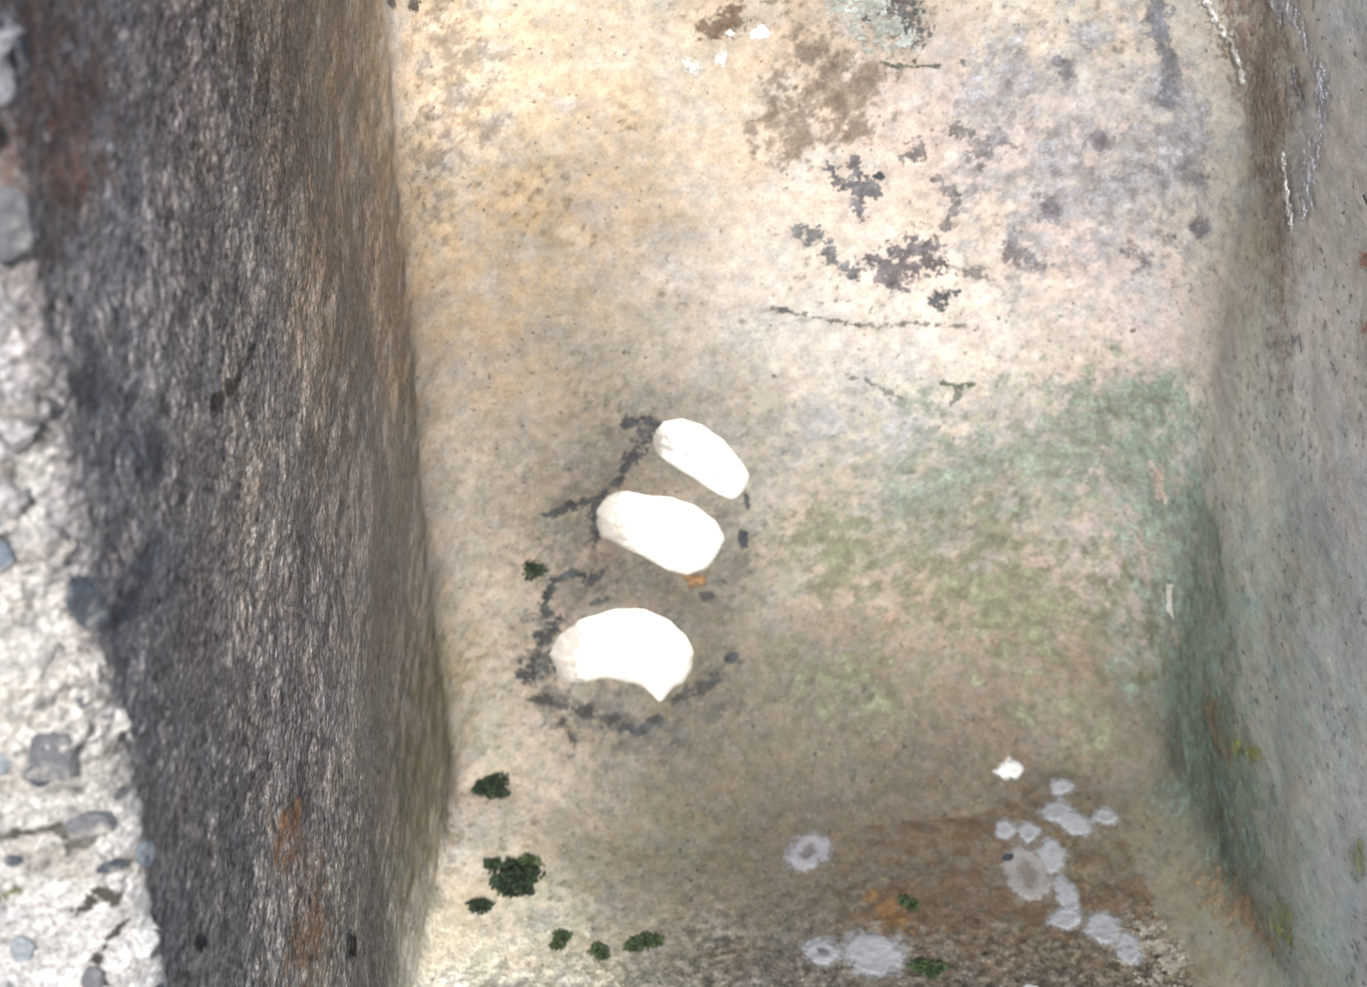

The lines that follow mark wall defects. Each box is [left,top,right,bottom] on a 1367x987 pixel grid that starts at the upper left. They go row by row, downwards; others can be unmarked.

leakage [695,0,777,41]
leakage [745,0,935,171]
leakage [953,0,1229,315]
crack [770,306,980,331]